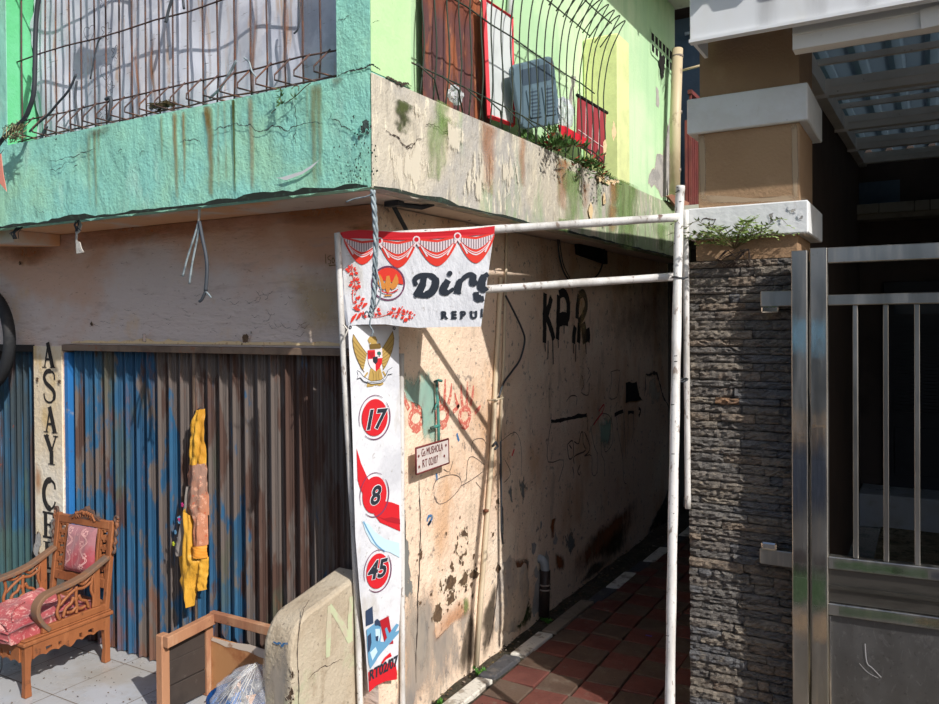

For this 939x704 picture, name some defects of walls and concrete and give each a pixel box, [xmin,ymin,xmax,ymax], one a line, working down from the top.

rust [173,113,185,156]
rust [204,107,212,164]
crack [182,101,354,143]
damp [431,102,450,147]
damp [555,170,674,257]
flaking render [405,511,480,628]
flaking render [285,664,299,704]